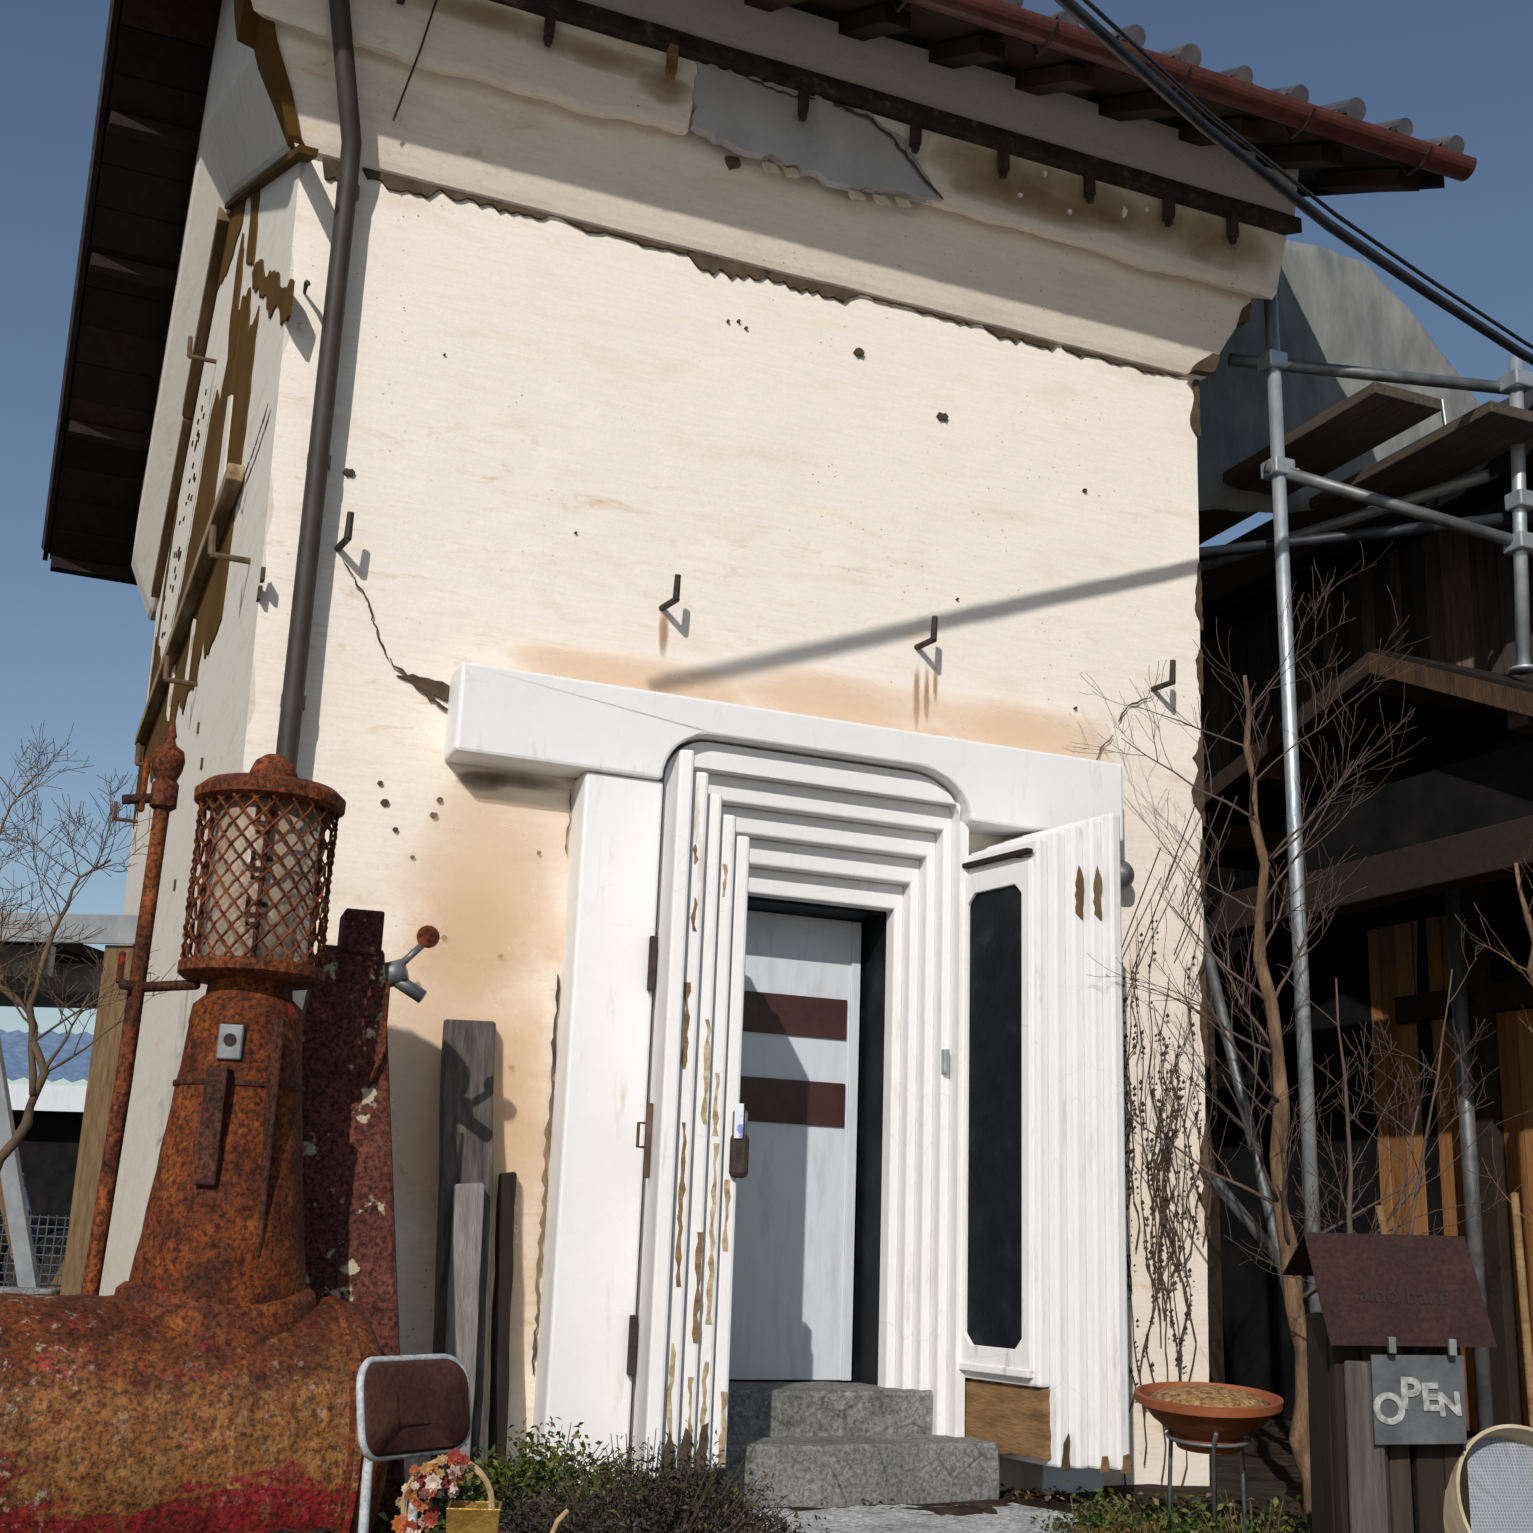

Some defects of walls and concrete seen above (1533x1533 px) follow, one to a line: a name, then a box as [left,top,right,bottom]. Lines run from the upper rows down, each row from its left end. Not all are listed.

peeling [322,157,340,182]
spalling [689,61,943,208]
peeling [362,167,1222,437]
peeling [133,190,311,830]
crack [342,559,448,711]
corrosion [914,670,937,721]
spalling [1195,562,1203,631]
spalling [1195,649,1203,695]
spalling [1191,736,1207,905]
spalling [1199,958,1209,1067]
peeling [675,982,731,1343]
peeling [662,1343,728,1475]